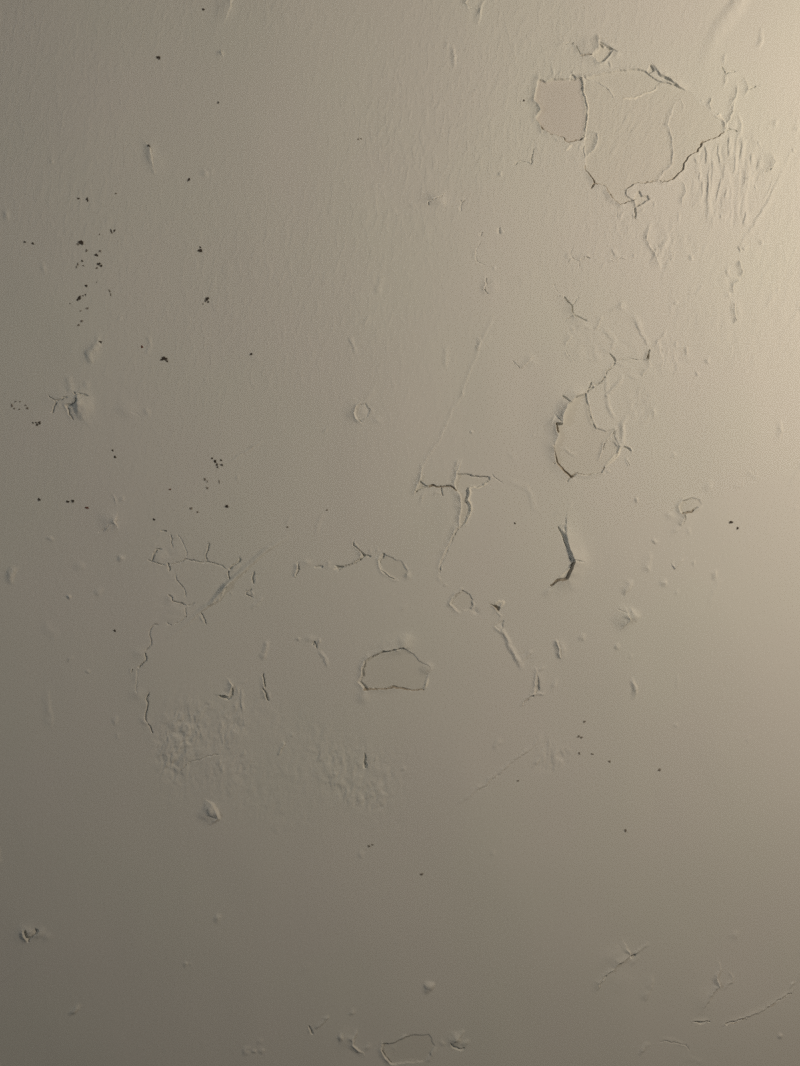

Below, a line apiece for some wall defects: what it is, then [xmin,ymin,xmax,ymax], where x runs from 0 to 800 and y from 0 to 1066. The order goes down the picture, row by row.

crack [553,284,588,326]
crack [293,539,379,579]
crack [544,513,596,597]
crack [129,531,241,734]
crack [260,673,272,702]
crack [661,970,800,1051]